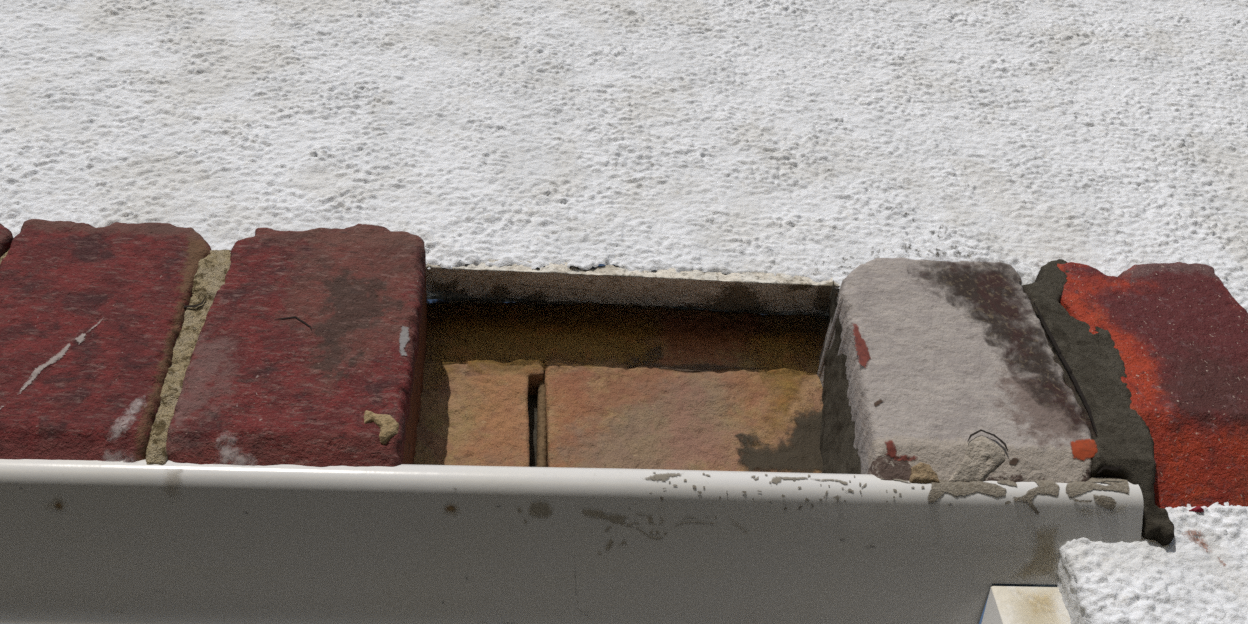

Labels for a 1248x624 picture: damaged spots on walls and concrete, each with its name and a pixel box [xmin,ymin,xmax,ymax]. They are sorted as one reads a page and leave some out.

damp [427,279,867,510]
damp [920,257,1090,425]
damp [582,472,717,554]
damp [881,477,1129,515]